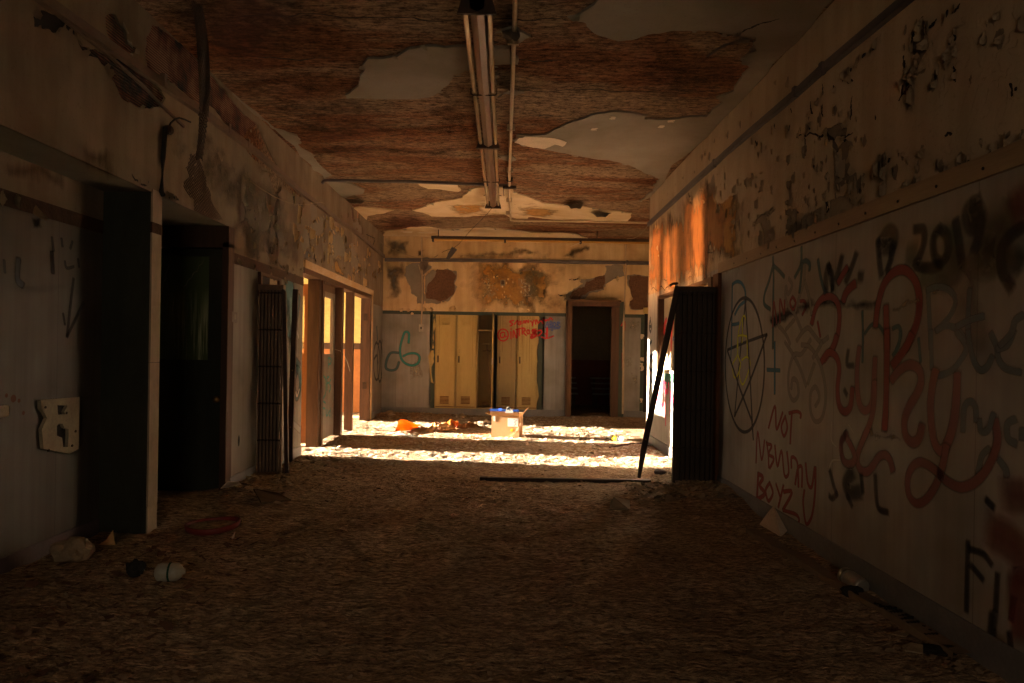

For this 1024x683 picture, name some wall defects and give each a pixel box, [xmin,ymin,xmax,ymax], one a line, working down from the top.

flaking render [32,5,163,111]
peeling [515,135,567,149]
peeling [725,97,867,244]
flaking render [404,262,457,304]
flaking render [564,265,649,310]